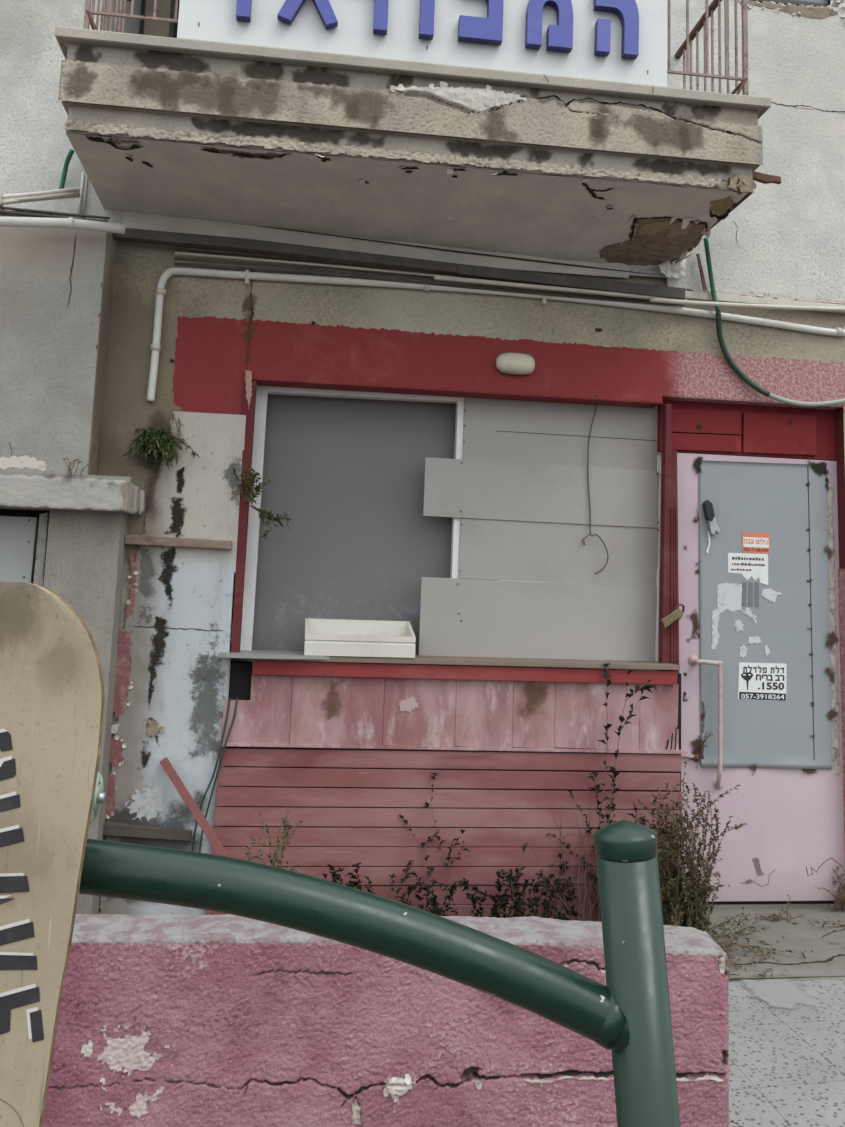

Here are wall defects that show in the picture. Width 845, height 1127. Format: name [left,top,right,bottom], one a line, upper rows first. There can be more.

damp [68,46,101,96]
damp [134,50,412,146]
spalling [390,81,527,114]
crack [522,73,751,141]
spalling [600,175,757,266]
peeling [0,455,46,471]
damp [139,467,187,704]
damp [189,624,226,757]
crack [562,959,605,970]
crack [50,1078,386,1107]
crack [416,1070,614,1090]
crack [676,1072,724,1082]